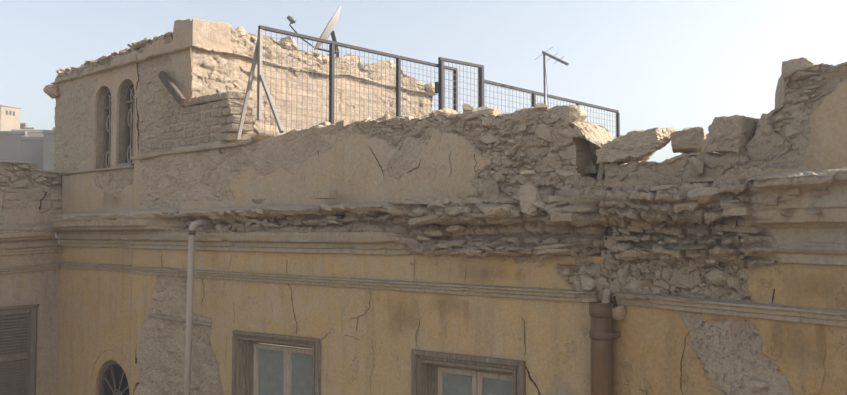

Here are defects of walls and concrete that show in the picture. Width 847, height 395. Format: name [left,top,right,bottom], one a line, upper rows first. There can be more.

spalling [53,77,99,173]
spalling [249,62,847,197]
crack [523,320,541,395]
spalling [684,318,792,395]